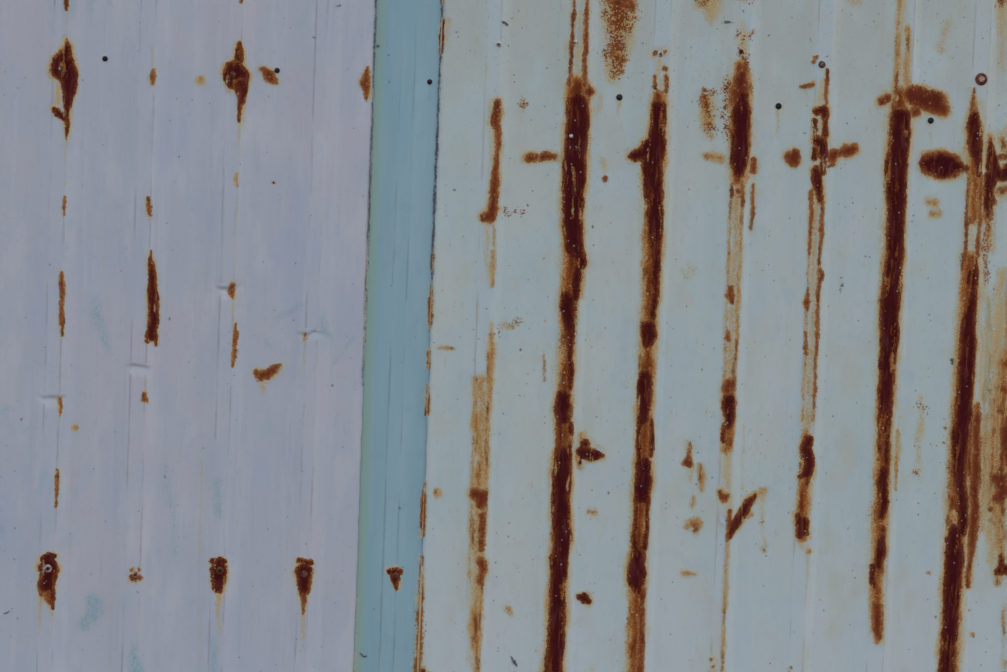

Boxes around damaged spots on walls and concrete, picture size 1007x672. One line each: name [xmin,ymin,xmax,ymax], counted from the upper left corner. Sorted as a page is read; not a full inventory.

corrosion [32,550,63,639]
corrosion [44,0,81,218]
corrosion [141,250,163,347]
corrosion [197,458,230,653]
corrosion [193,37,281,368]
corrosion [289,554,318,650]
corrosion [463,317,524,672]
corrosion [475,93,530,288]
corrosion [519,0,673,672]
corrosion [679,19,769,672]
corrosion [780,53,863,605]
corrosion [862,0,1007,672]